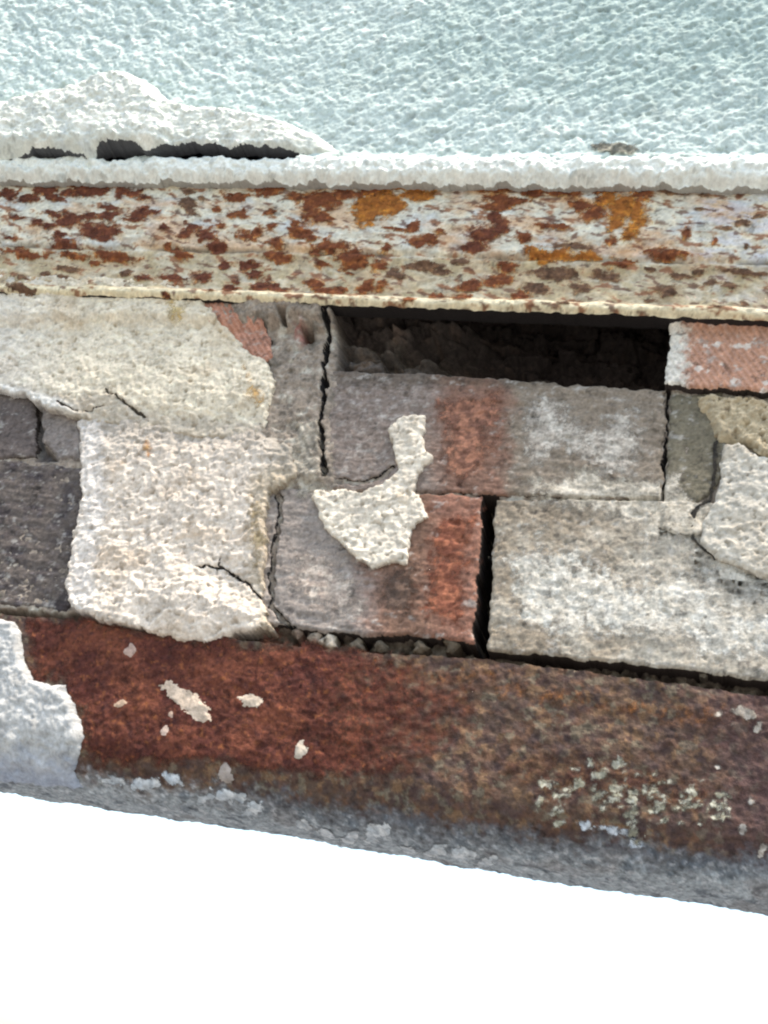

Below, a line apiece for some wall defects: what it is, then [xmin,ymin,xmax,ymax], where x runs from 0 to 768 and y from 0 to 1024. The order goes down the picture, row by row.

rust [0,185,768,322]
crack [318,307,395,486]
crack [199,494,296,630]
crack [691,440,718,560]
rust [25,617,475,779]
rust [500,750,714,810]